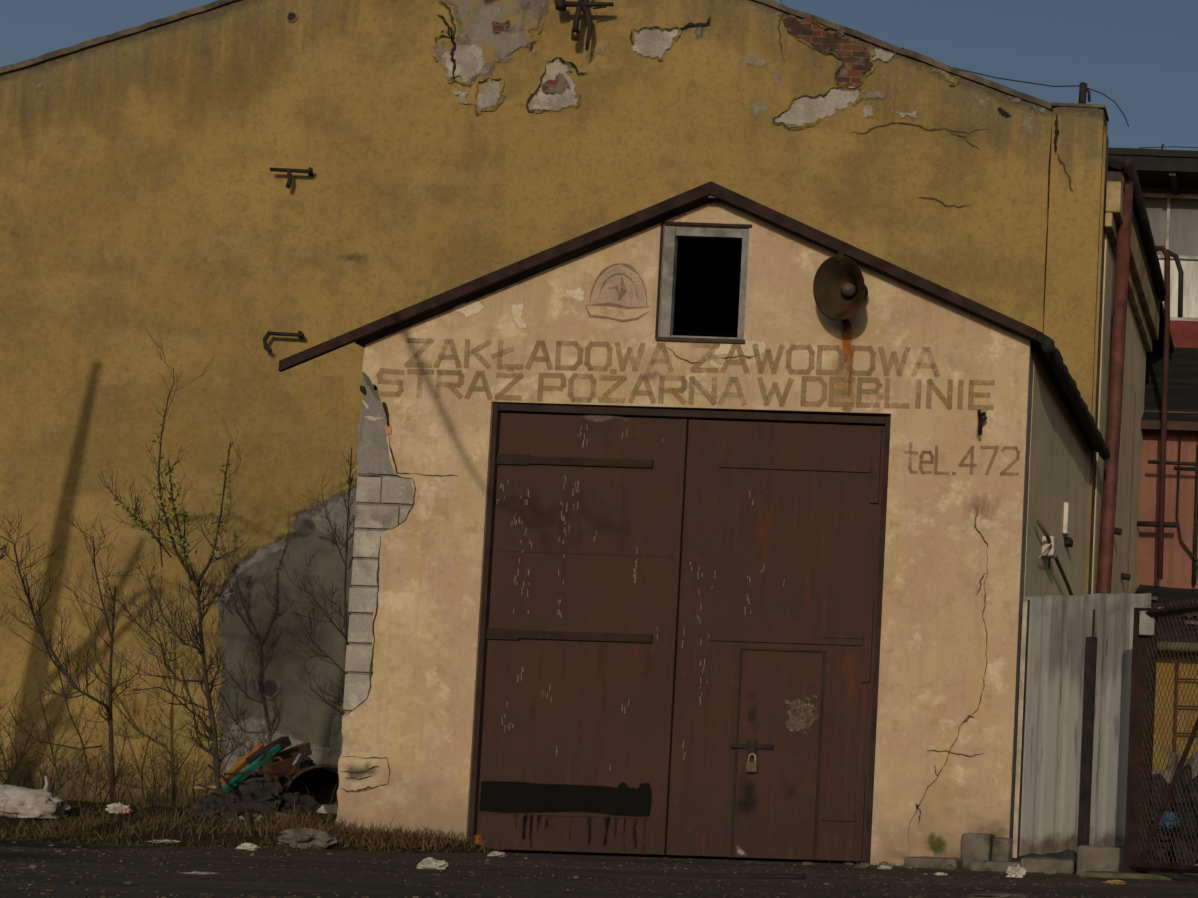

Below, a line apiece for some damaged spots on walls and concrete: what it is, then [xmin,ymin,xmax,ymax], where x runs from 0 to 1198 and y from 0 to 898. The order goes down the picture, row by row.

peeling [433,0,587,115]
peeling [630,17,711,61]
peeling [746,14,917,130]
crack [1043,114,1073,333]
rust [842,325,852,385]
flaking render [343,372,457,717]
crack [908,506,988,842]
flaking render [340,756,390,793]